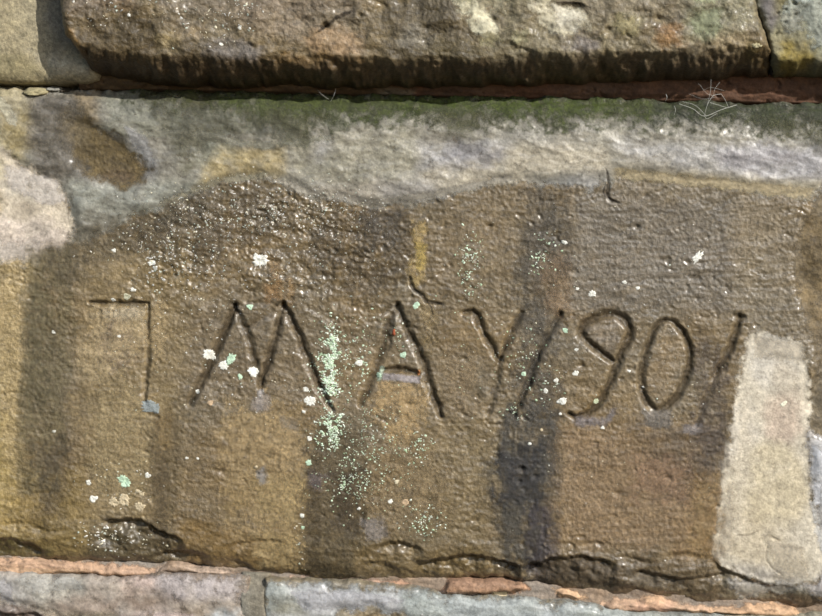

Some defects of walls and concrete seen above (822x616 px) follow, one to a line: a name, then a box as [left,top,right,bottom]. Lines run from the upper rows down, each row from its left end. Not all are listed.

water stain [492,193,568,576]